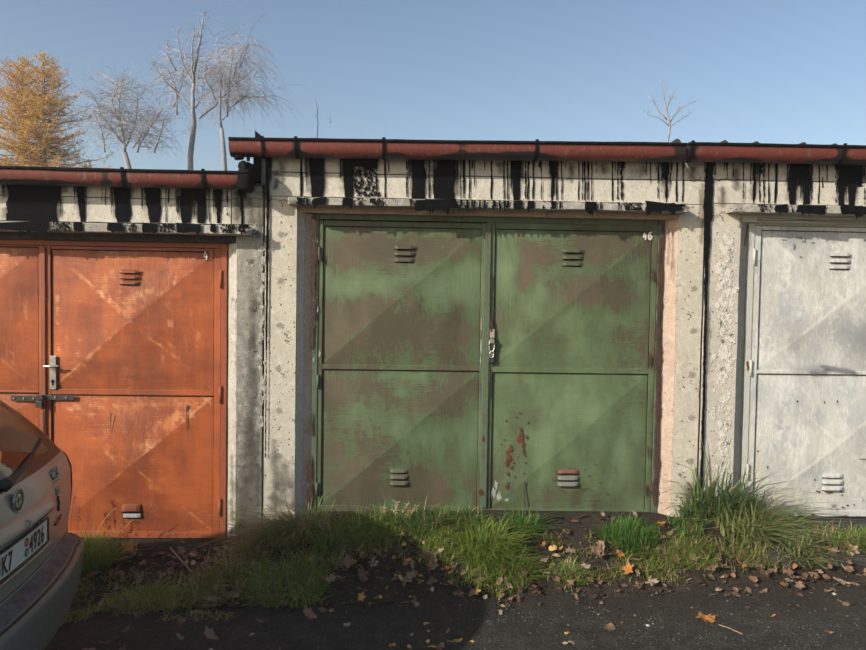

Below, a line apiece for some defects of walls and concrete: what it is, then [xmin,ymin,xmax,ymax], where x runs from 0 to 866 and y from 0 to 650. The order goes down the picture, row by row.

leakage [3,185,86,222]
leakage [101,187,133,222]
leakage [300,158,326,197]
leakage [341,159,389,198]
leakage [406,159,625,201]
leakage [641,162,866,220]
leakage [142,158,296,535]
peeling [710,233,739,497]
corrosion [500,412,529,507]